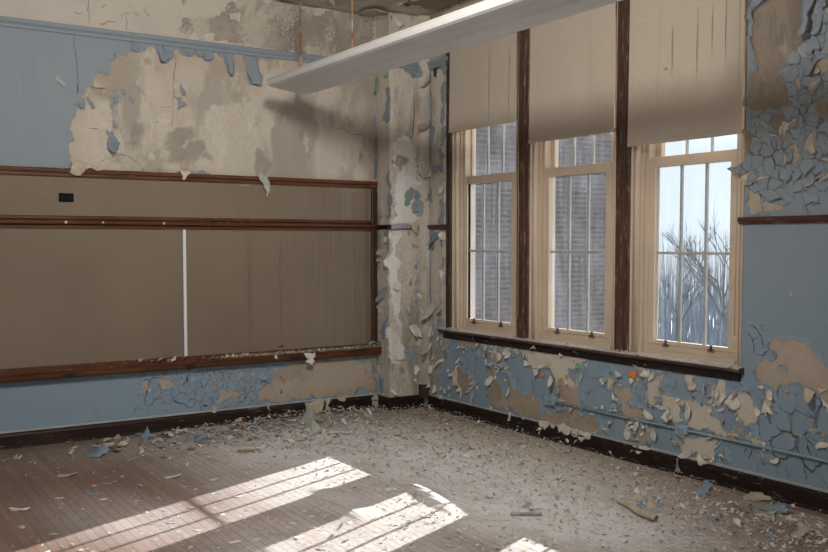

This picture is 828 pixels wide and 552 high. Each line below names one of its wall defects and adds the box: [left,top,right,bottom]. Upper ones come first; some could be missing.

water stain [118,100,232,172]
peeling [63,0,828,473]